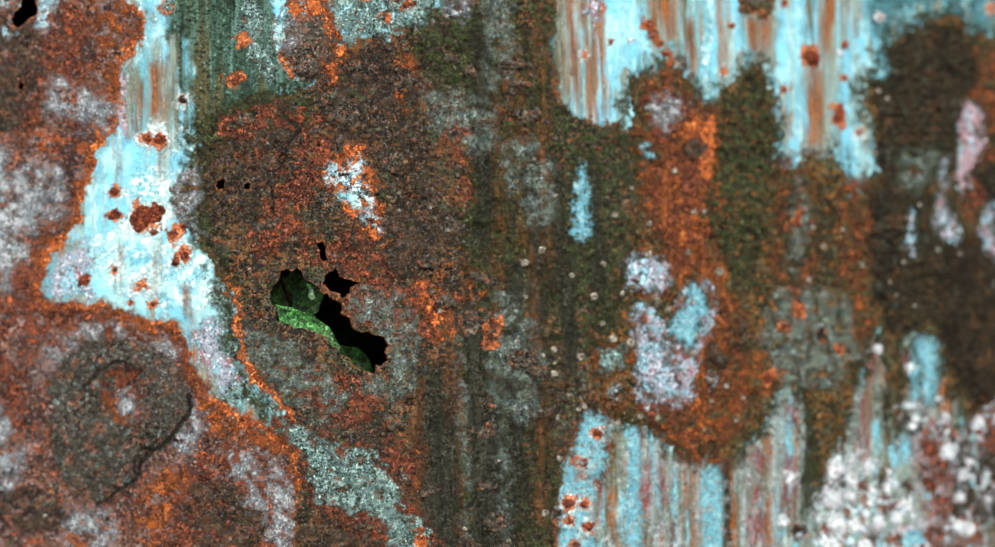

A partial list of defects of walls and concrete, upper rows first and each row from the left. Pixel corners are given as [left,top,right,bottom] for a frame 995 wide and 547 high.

corrosion [718,0,789,80]
corrosion [0,0,777,547]
corrosion [776,301,806,333]
corrosion [851,343,878,445]
corrosion [739,406,809,547]